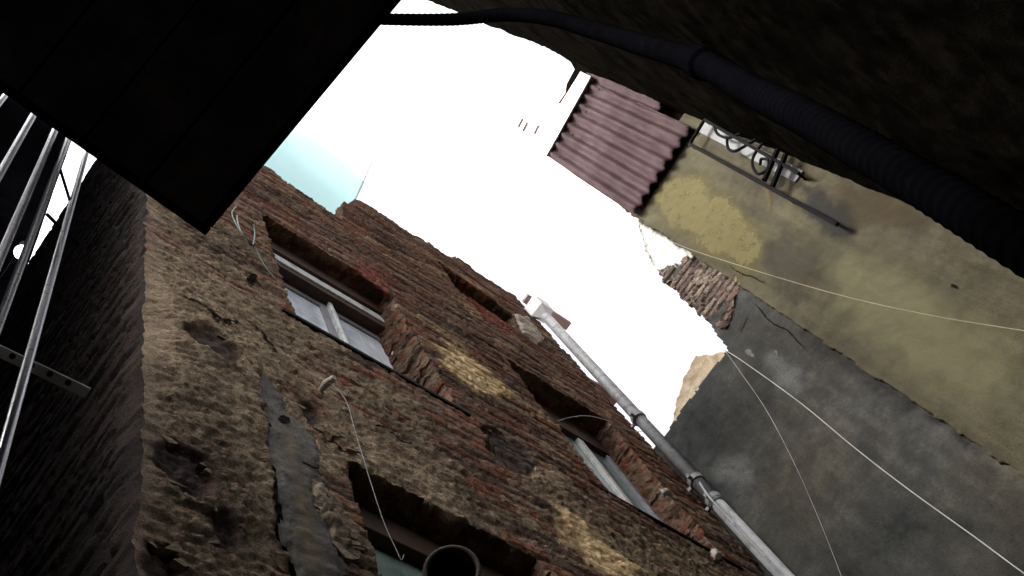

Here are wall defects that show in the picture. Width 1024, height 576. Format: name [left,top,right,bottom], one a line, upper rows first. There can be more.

peeling [636,176,765,331]
spalling [189,326,238,362]
crack [183,296,278,353]
crack [729,265,804,347]
spalling [483,427,541,476]
spalling [150,435,246,556]
flaking render [311,478,364,564]